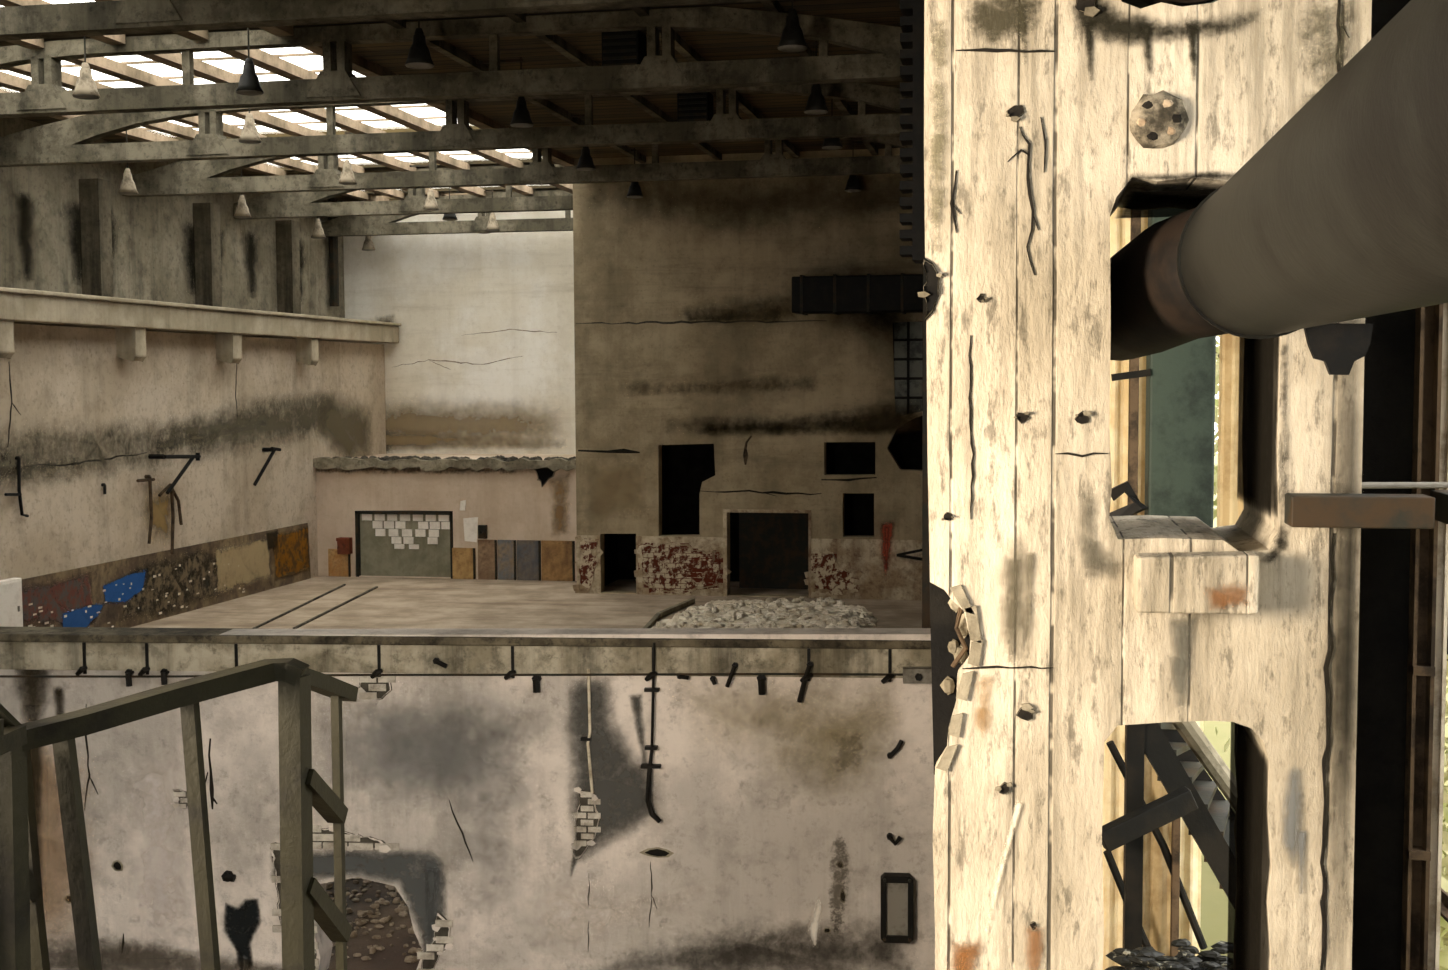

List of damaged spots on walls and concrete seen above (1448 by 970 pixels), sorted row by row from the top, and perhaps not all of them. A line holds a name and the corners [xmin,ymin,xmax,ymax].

water stain [1017,7,1026,54]
crack [1007,117,1046,275]
water stain [16,195,32,276]
water stain [0,398,549,485]
water stain [706,414,922,434]
rust [1211,587,1245,608]
spalling [929,563,983,775]
rust [955,947,974,970]
rust [1028,929,1039,970]